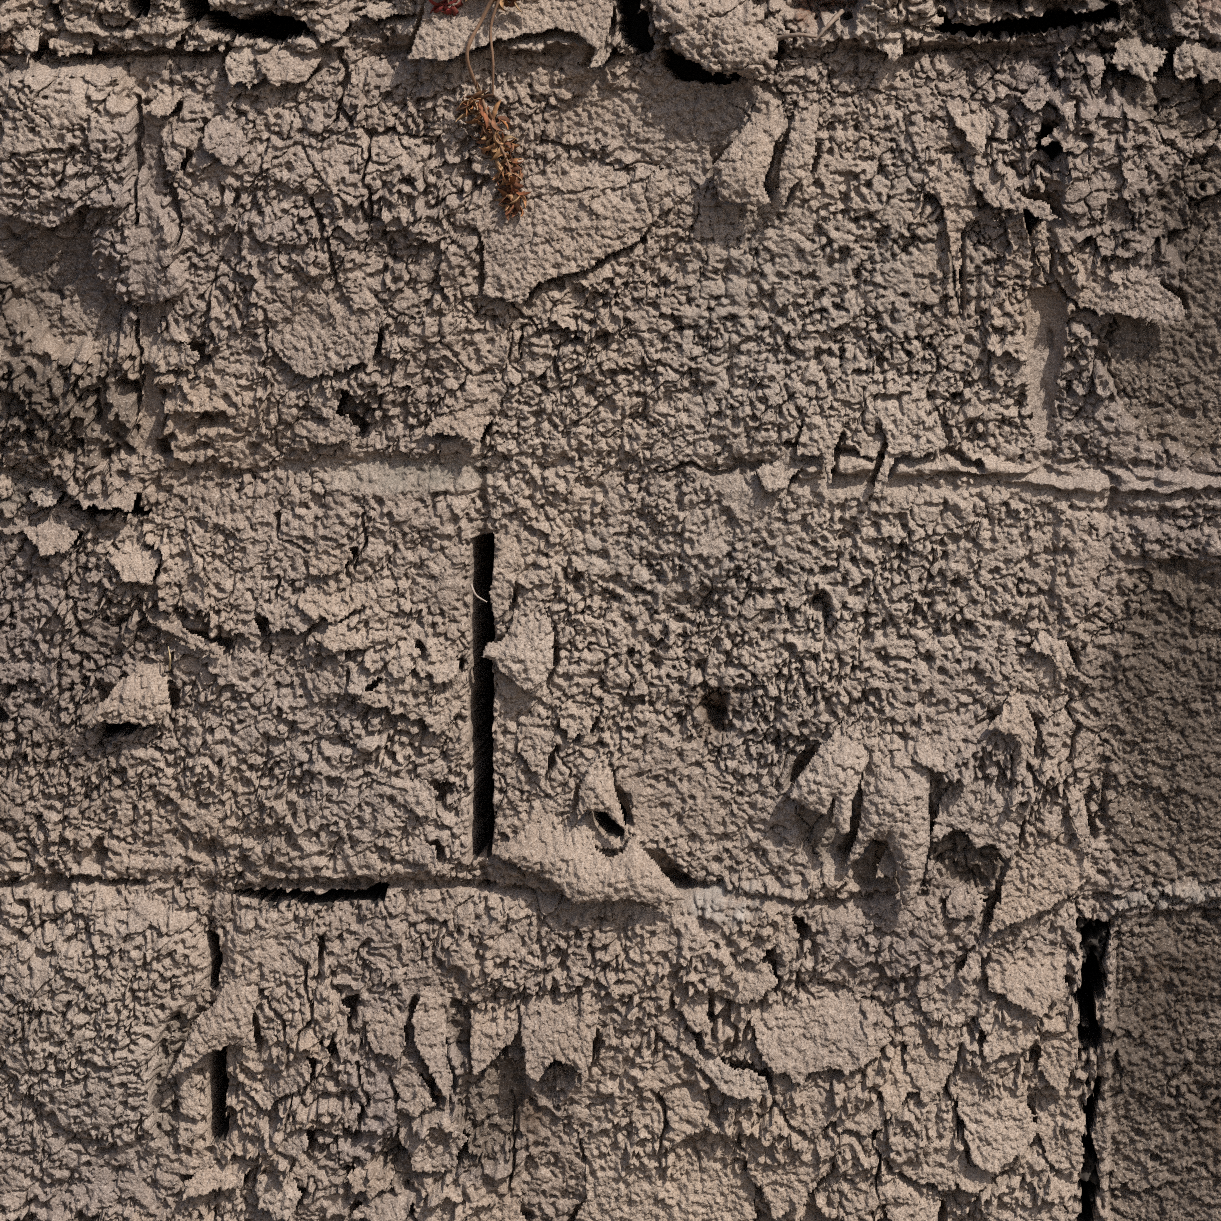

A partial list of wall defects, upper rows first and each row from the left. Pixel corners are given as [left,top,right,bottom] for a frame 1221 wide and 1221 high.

crack [126,94,184,257]
crack [327,47,434,252]
crack [542,139,664,173]
crack [308,197,335,272]
crack [127,317,146,436]
crack [497,297,636,365]
peeling [87,653,172,729]
peeling [150,534,1221,1221]
crack [259,960,371,1170]
crack [509,1089,519,1183]
peeling [58,1197,100,1221]